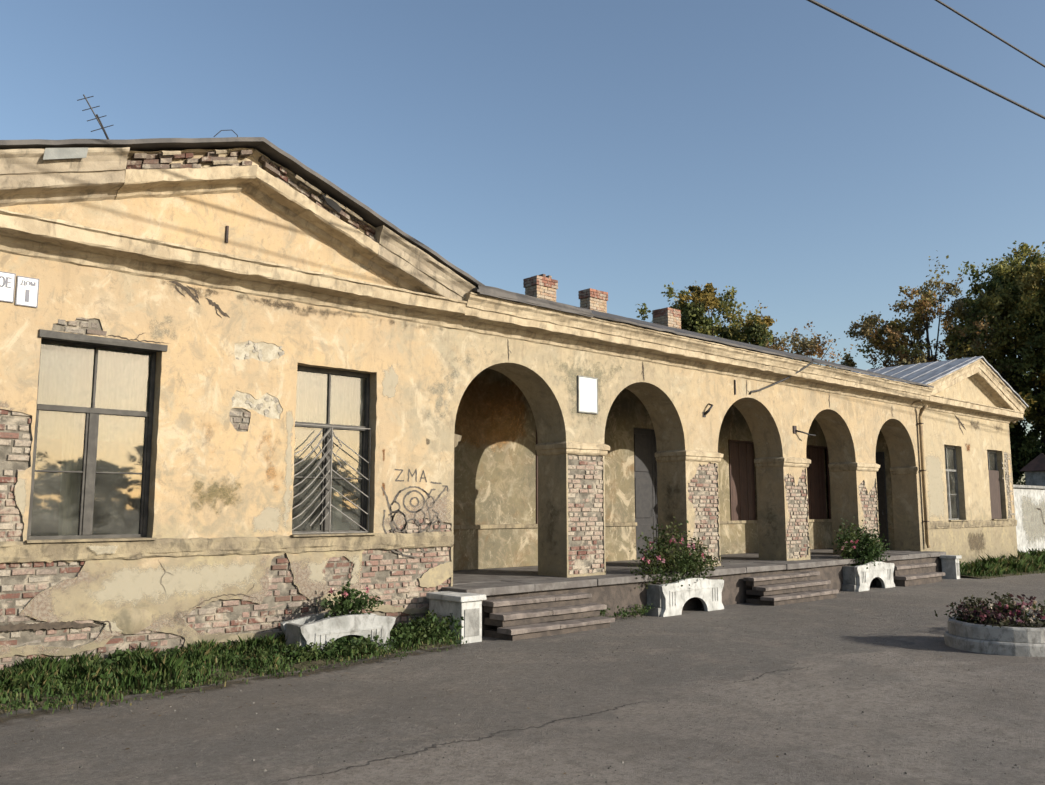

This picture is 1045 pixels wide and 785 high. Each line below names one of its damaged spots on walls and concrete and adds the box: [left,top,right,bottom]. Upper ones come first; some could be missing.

flaking render [51,317,107,336]
crack [169,281,230,318]
flaking render [234,340,285,363]
flaking render [0,404,33,542]
flaking render [229,390,294,525]
flaking render [384,495,452,533]
flaking render [567,454,605,575]
flaking render [688,462,721,565]
flaking render [784,468,810,559]
flaking render [858,478,879,541]
flaking render [0,547,452,671]